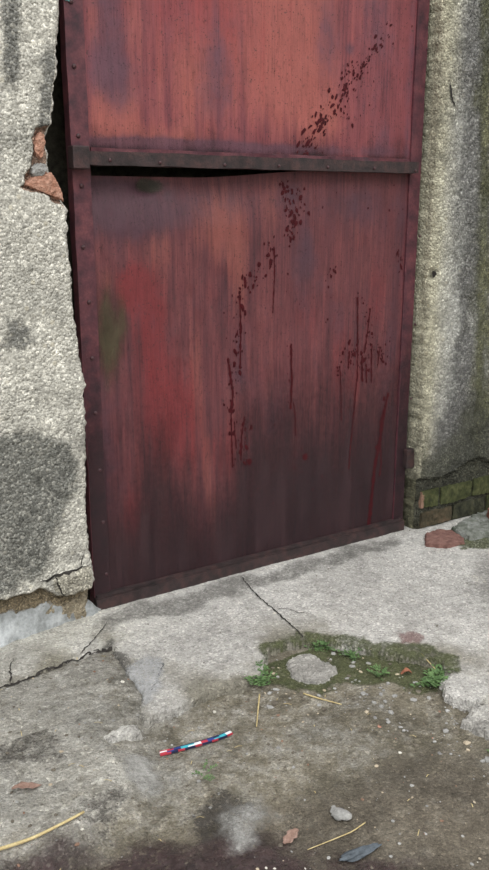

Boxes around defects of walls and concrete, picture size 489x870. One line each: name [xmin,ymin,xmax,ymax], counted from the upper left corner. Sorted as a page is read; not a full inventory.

spalling [21,126,64,207]
leakage [414,0,489,517]
leakage [0,432,77,594]
crack [40,554,89,596]
leakage [88,432,110,598]
leakage [337,293,391,480]
leakage [394,366,411,519]
spalling [413,461,489,529]
crack [0,622,112,688]